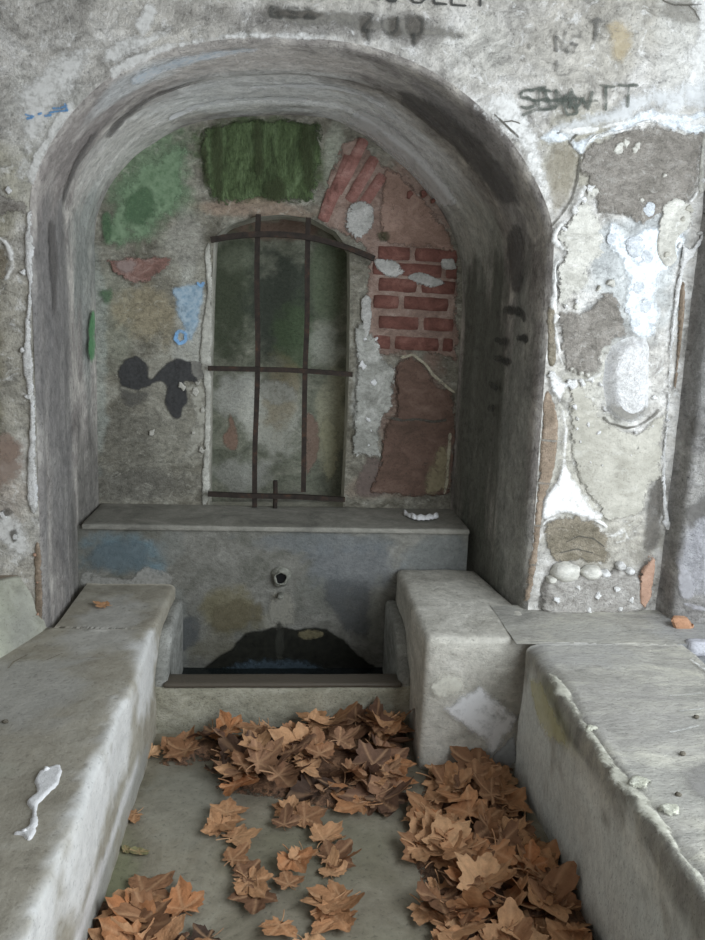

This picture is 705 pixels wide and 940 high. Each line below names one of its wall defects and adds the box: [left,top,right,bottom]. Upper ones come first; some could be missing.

flaking render [579,120,705,224]
flaking render [0,237,26,279]
flaking render [318,137,459,498]
flaking render [547,279,628,381]
flaking render [674,282,685,388]
flaking render [524,391,655,613]